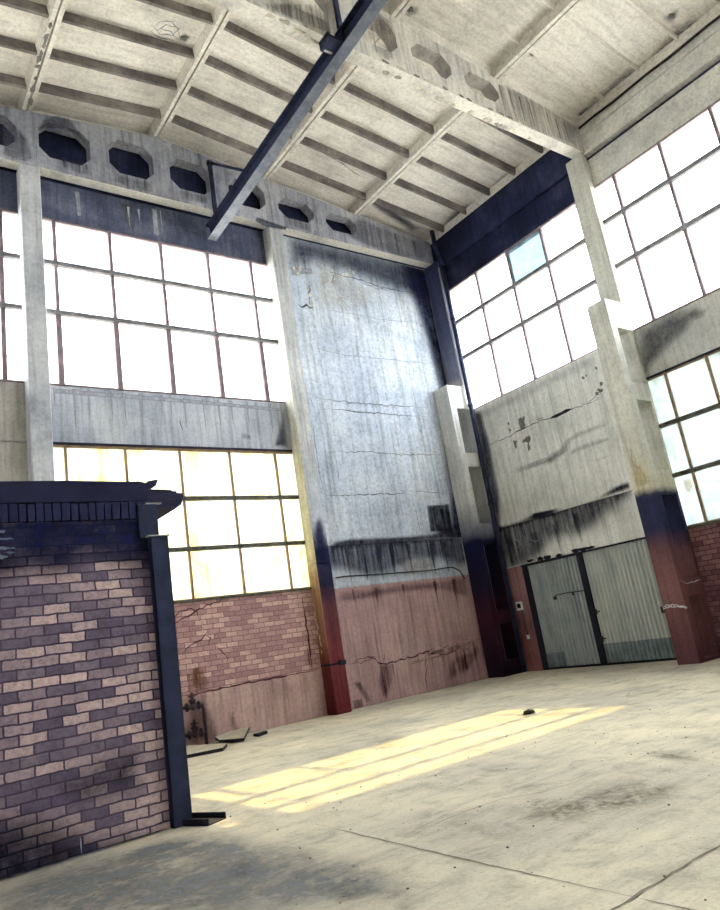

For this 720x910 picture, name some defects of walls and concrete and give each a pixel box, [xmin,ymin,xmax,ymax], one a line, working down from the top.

crack [311,397,444,531]
spalling [508,416,531,451]
crack [492,393,605,444]
crack [175,593,228,662]
crack [184,602,312,696]
crack [353,640,476,690]